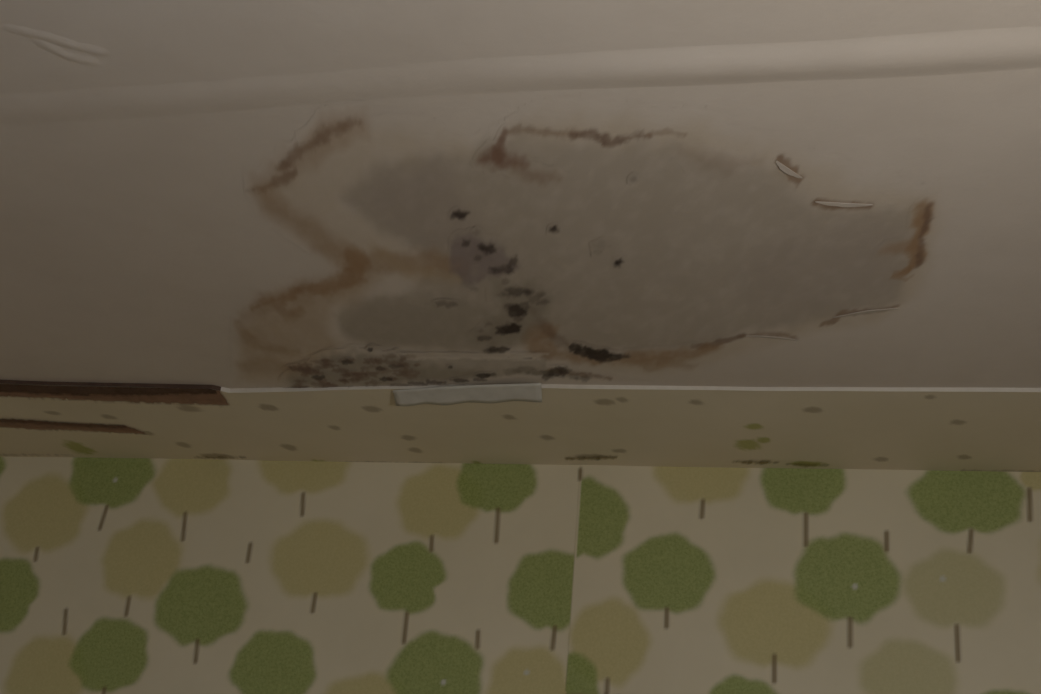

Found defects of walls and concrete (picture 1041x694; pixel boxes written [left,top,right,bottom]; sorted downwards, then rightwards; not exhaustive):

damp [228,93,956,388]